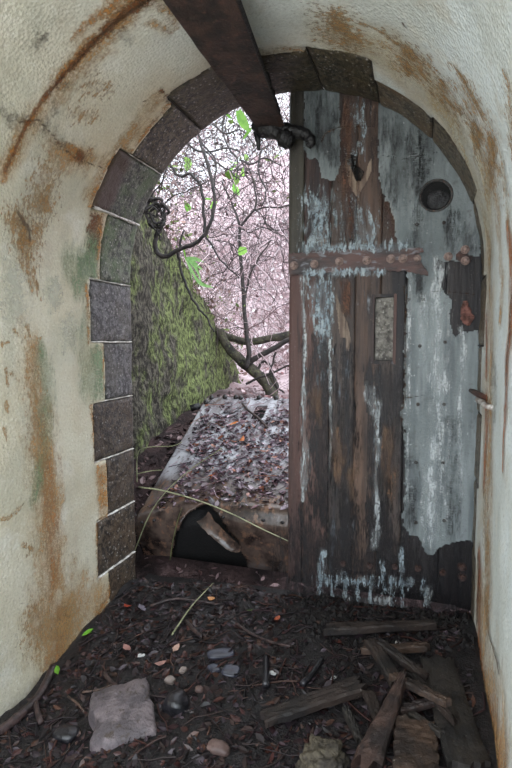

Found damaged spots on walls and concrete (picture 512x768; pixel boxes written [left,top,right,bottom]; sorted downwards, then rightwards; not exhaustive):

rust [0,0,151,183]
flaking render [307,4,502,207]
peeling [297,185,408,254]
rust [460,301,474,325]
rust [13,325,110,672]